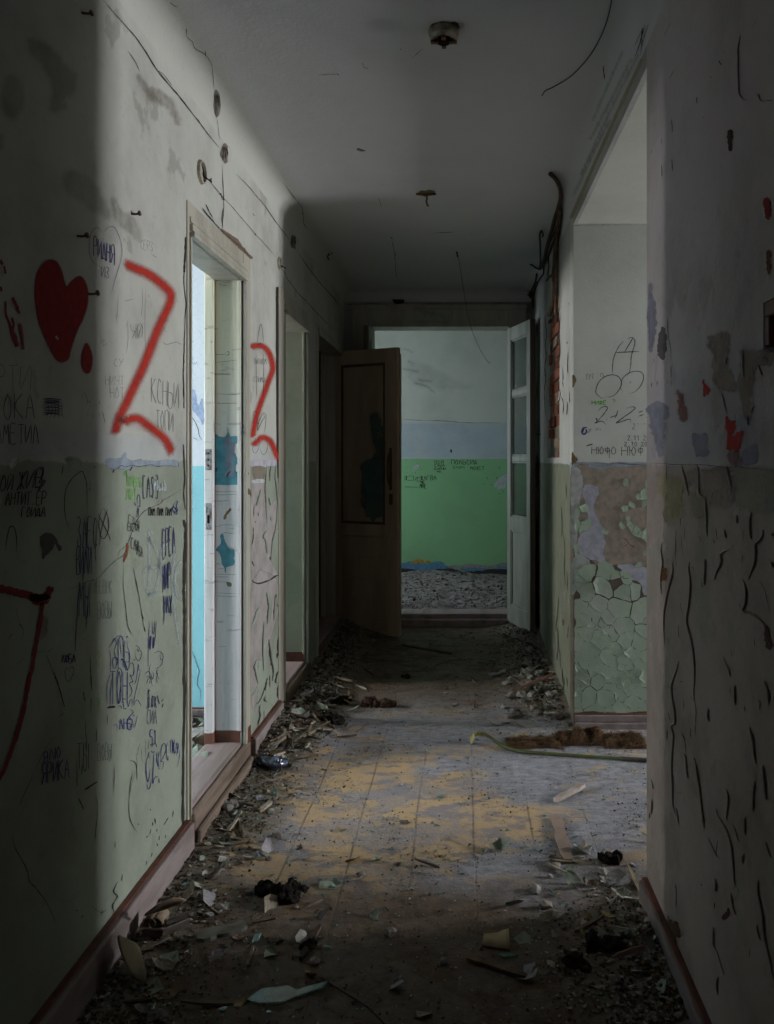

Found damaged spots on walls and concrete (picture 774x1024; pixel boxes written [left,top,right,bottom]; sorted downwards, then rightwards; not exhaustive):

peeling [215,424,278,710]
crack [215,466,279,726]
peeling [544,298,647,713]
peeling [647,283,667,360]
peeling [646,402,669,456]
crack [639,463,774,995]